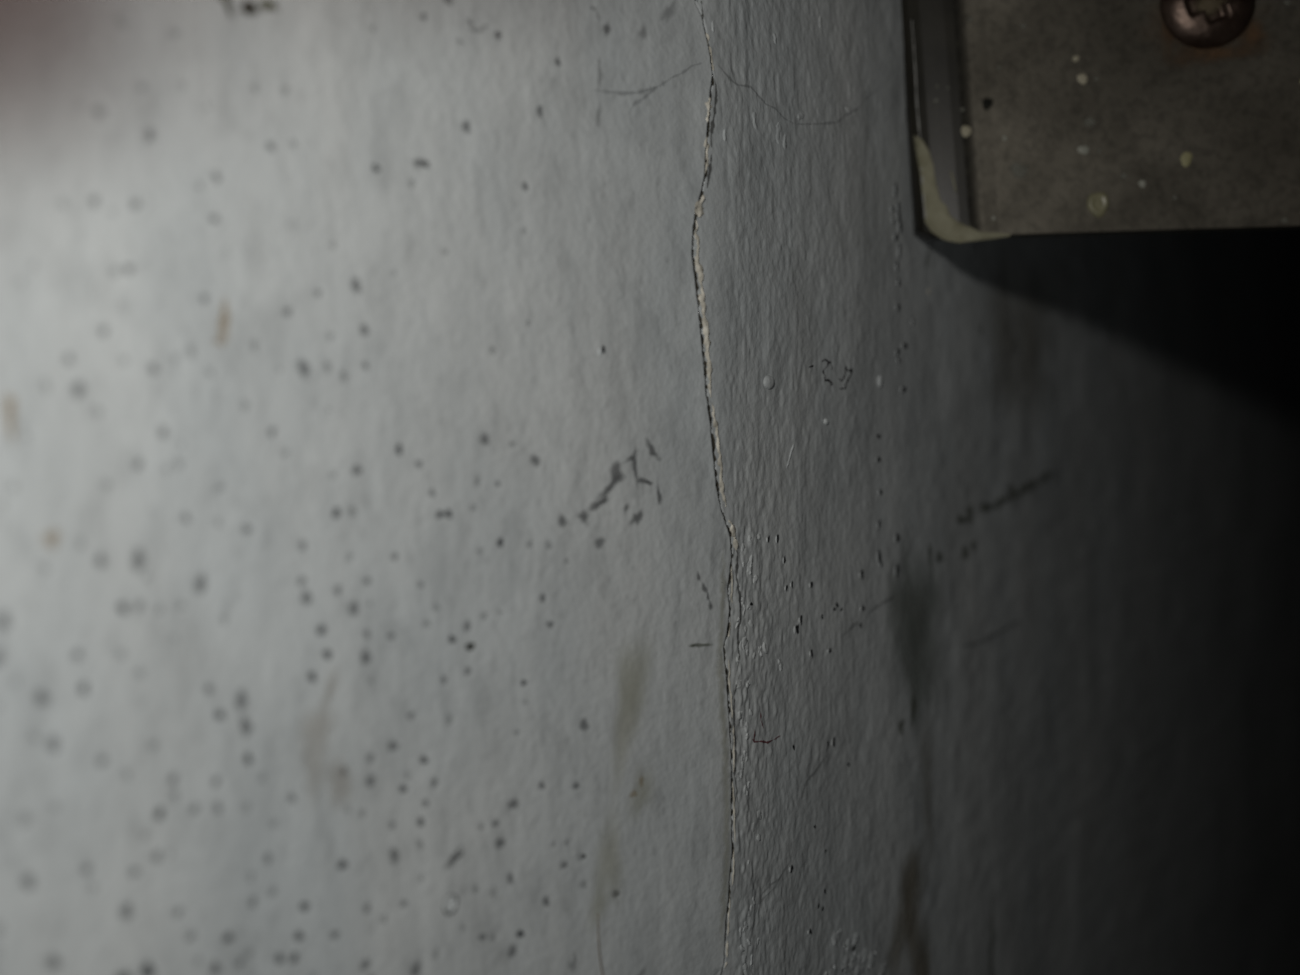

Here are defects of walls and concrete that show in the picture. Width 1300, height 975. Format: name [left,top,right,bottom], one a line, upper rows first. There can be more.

water stain [580,457,661,520]
crack [692,1,744,975]